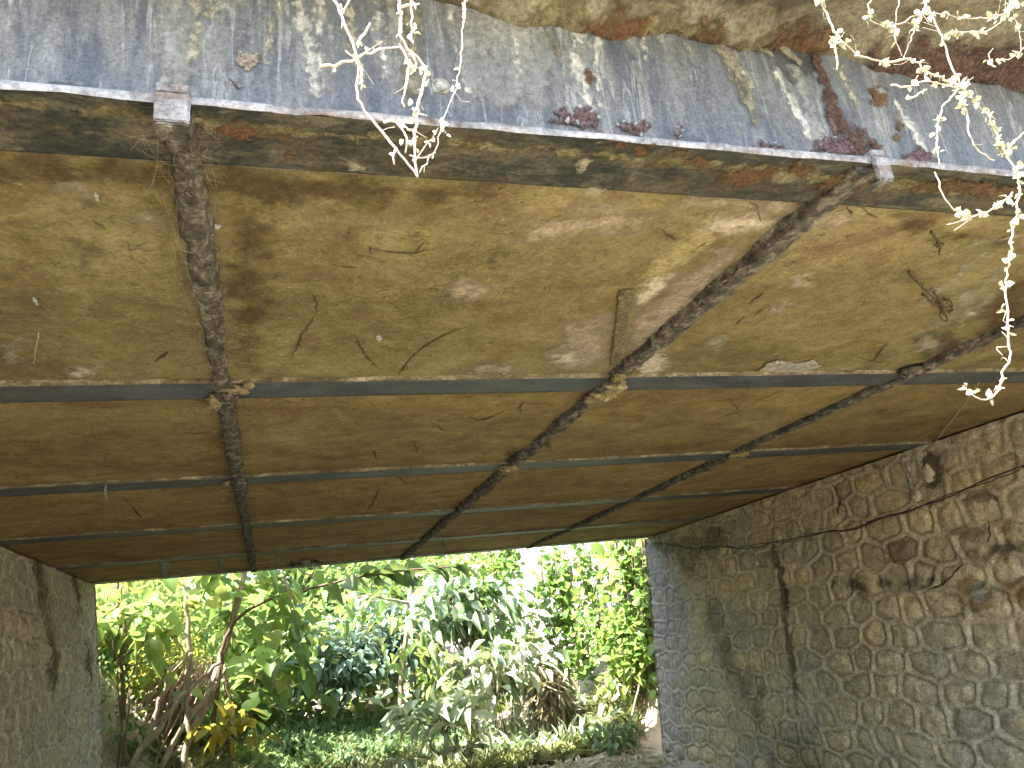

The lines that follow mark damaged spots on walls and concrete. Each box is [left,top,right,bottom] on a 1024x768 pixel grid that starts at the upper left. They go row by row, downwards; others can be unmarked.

corrosion [765,15,886,157]
corrosion [867,35,1024,91]
damp [224,264,266,350]
crack [291,291,318,357]
crack [355,325,473,377]
flaking render [759,360,823,373]